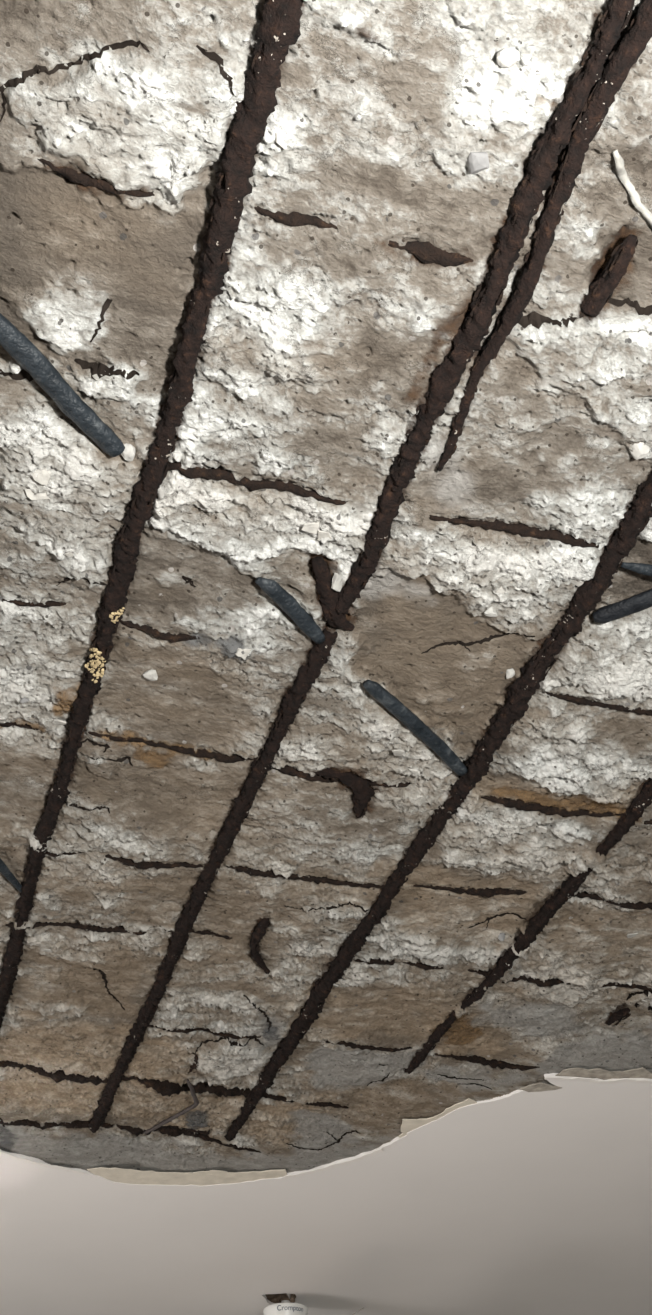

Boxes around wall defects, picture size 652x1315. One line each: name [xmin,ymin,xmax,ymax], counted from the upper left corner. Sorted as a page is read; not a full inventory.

crack [0,40,150,122]
spalling [0,0,265,186]
spalling [0,163,218,394]
rust [424,293,479,366]
spalling [348,37,652,765]
rust [315,555,337,583]
crack [81,738,133,766]
rust [493,787,640,821]
spalling [386,863,544,949]
rust [433,1015,482,1046]
spalling [349,1073,459,1136]
crack [437,1074,492,1090]